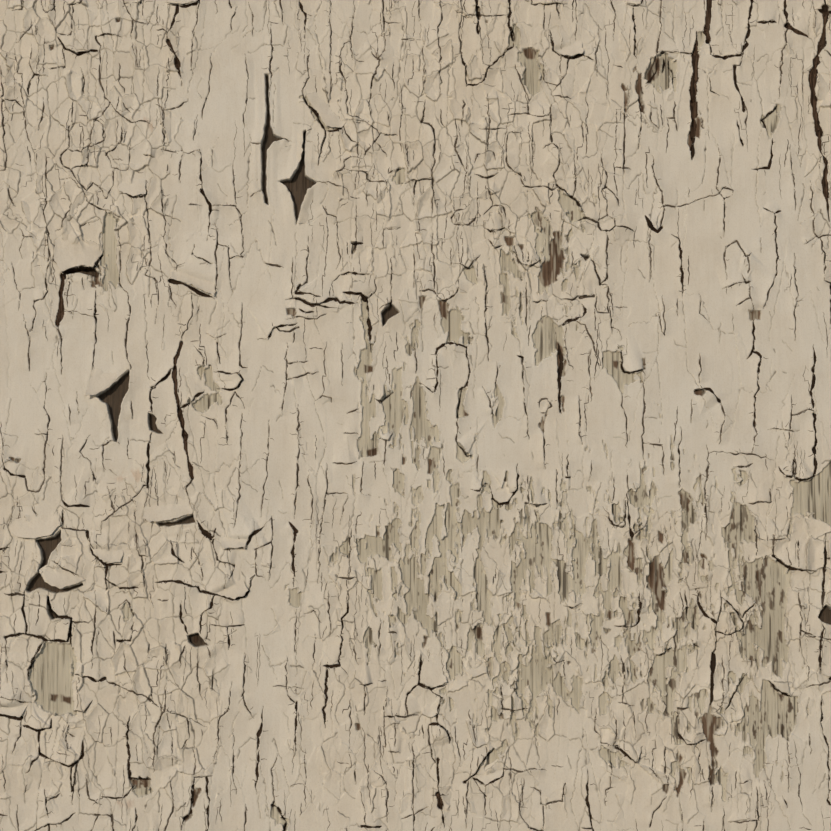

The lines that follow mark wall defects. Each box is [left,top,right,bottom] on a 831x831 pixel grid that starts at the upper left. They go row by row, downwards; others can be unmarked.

peeling [299,95,329,130]
peeling [489,241,549,339]
crack [259,0,831,474]
peeling [527,187,586,292]
crack [0,0,393,831]
crack [471,431,570,514]
peeling [330,296,808,784]
crack [680,320,831,712]
peeling [787,461,831,537]
peeling [28,642,77,716]
crack [338,618,566,831]
crack [583,658,831,831]